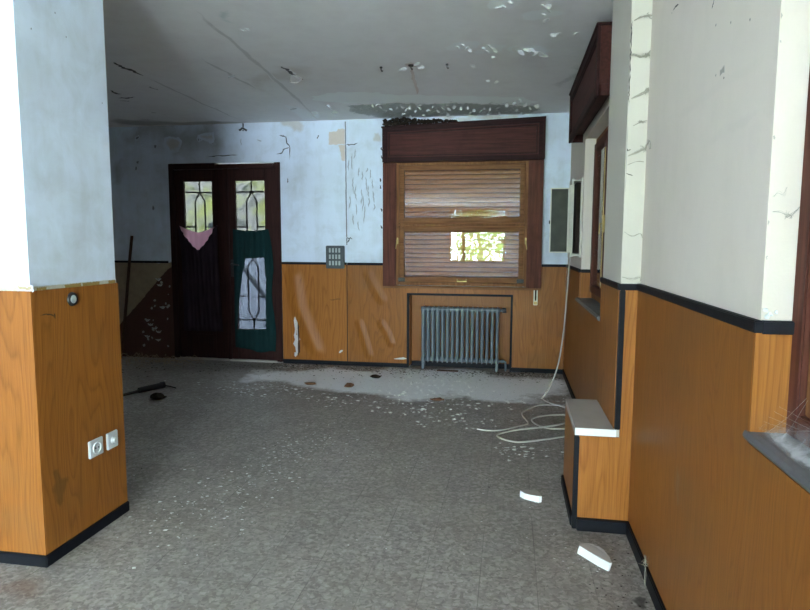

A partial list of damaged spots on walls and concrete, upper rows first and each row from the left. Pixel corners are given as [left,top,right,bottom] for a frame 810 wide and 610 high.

peeling [480,0,551,12]
crack [110,62,242,120]
crack [194,10,319,139]
peeling [277,91,544,135]
peeling [442,33,560,67]
crack [625,19,633,190]
crack [276,135,290,183]
spalling [328,128,345,162]
crack [344,121,357,245]
peeling [0,260,175,358]